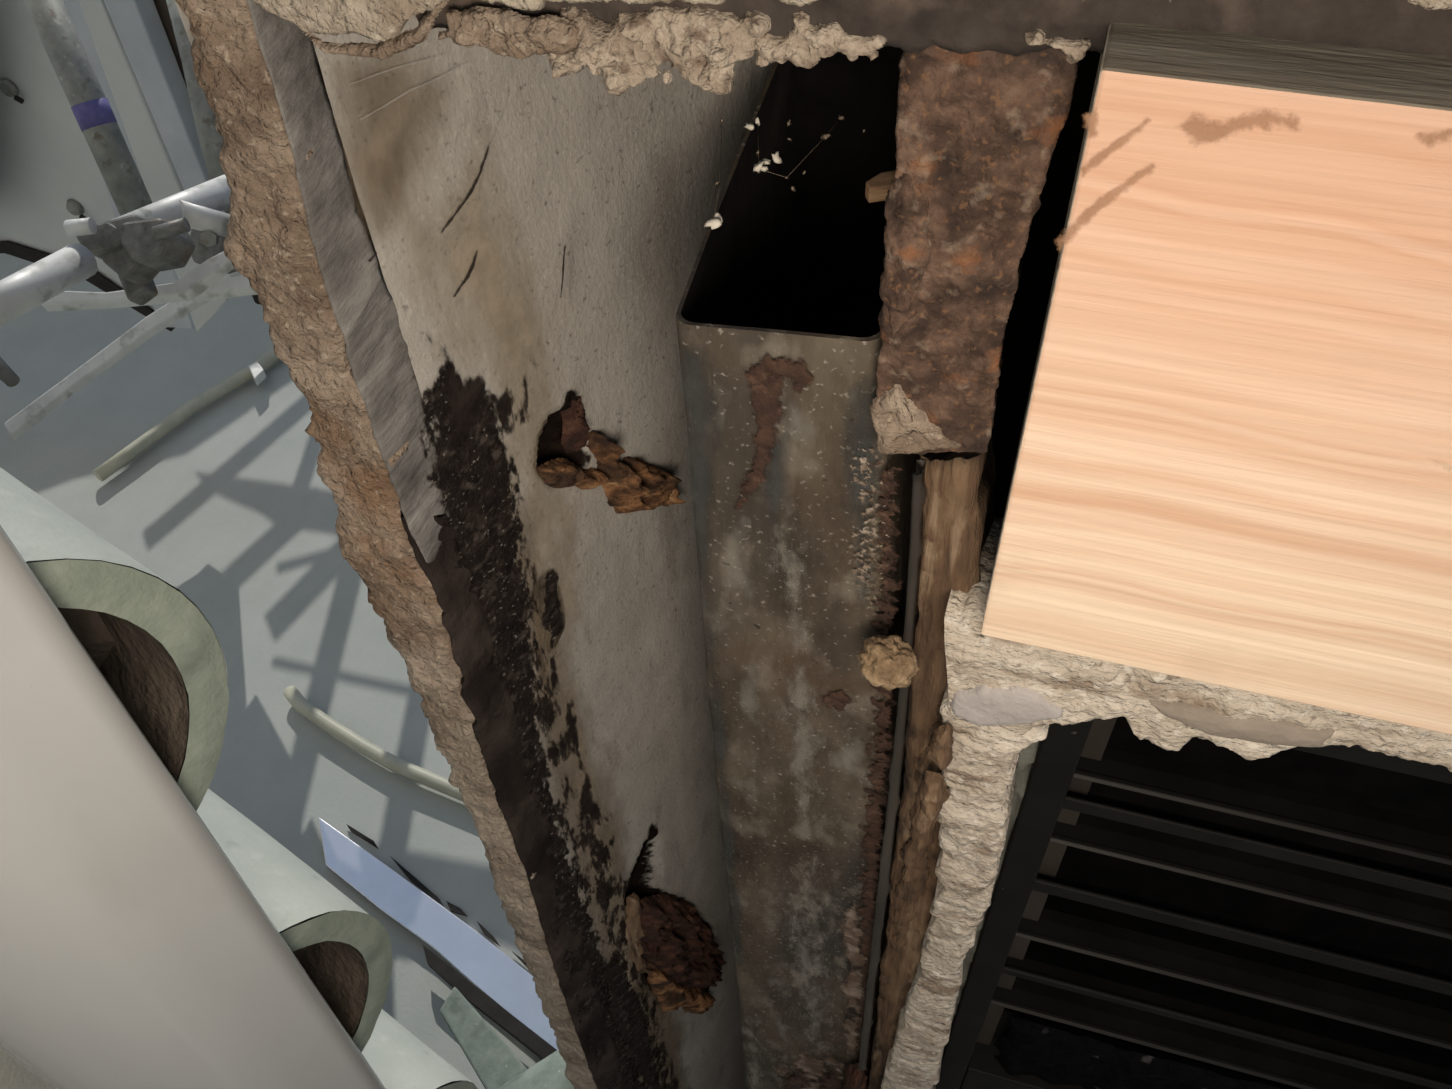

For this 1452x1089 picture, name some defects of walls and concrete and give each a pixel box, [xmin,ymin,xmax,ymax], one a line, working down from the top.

spalling [301,0,887,96]
spalling [1024,29,1092,64]
peeling [704,118,724,229]
peeling [744,115,845,192]
corrosion [734,354,814,510]
spalling [175,0,597,1089]
corrosion [841,442,902,637]
spalling [918,723,954,820]
corrosion [773,684,896,1089]